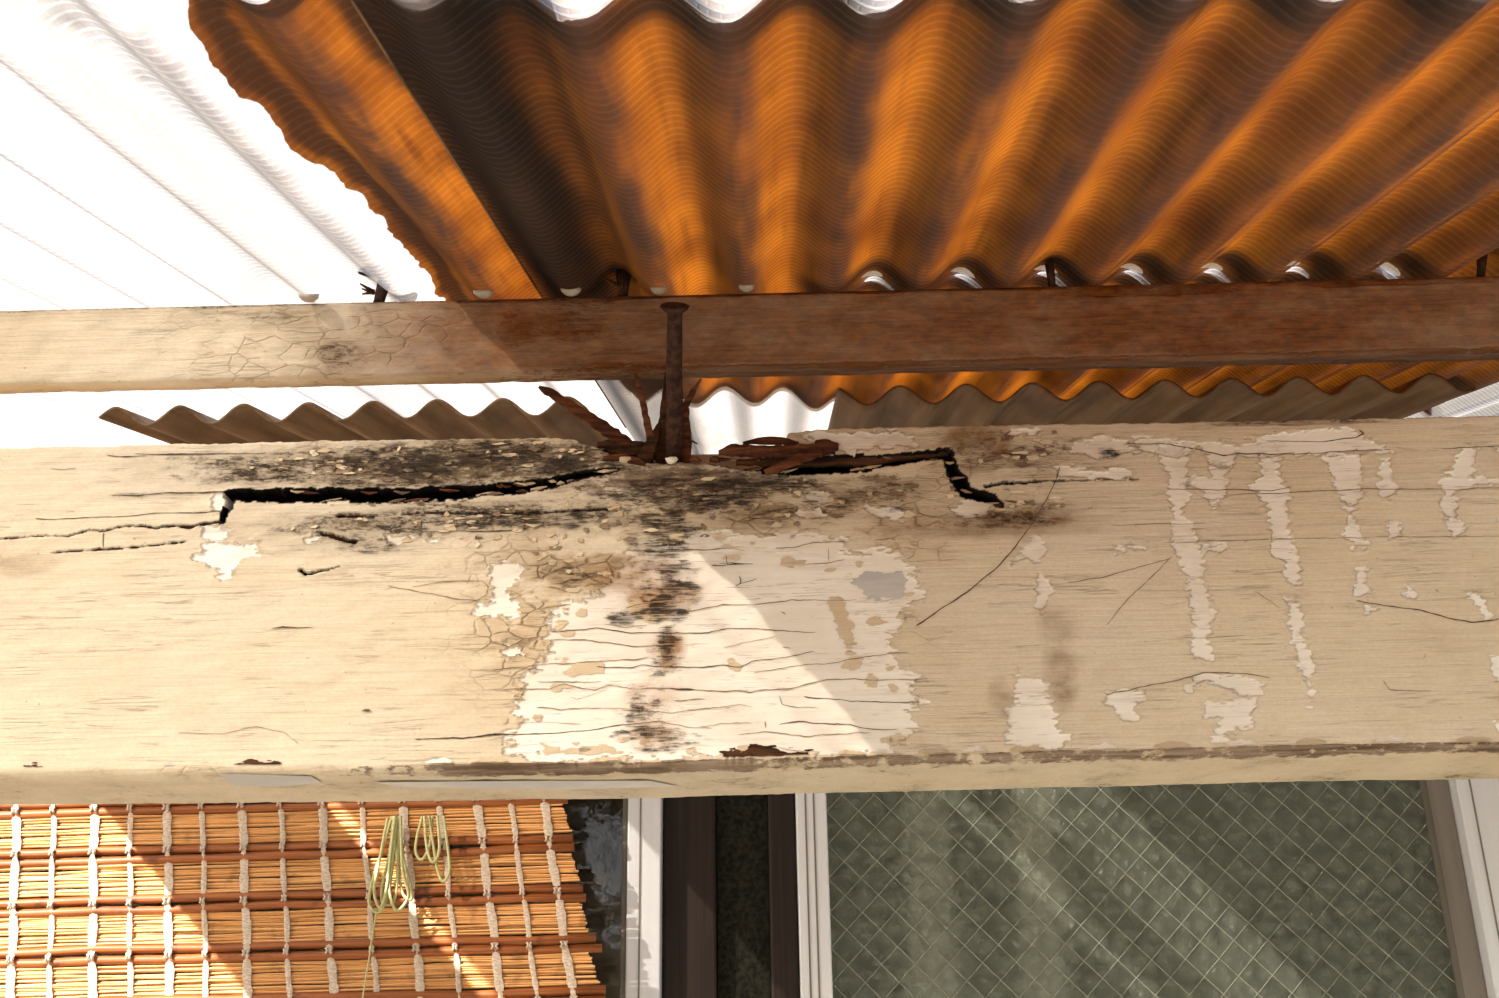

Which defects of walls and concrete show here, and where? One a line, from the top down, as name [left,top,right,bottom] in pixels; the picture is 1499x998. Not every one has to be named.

peeling [191,493,262,582]
crack [4,448,618,553]
peeling [291,525,357,544]
leakage [271,443,589,479]
leakage [461,474,816,676]
peeling [377,477,988,763]
peeling [947,426,1403,751]
peeling [1437,446,1499,538]
peeling [1467,592,1495,620]
peeling [1489,655,1499,681]
leakage [611,695,697,753]
peeling [371,781,680,789]